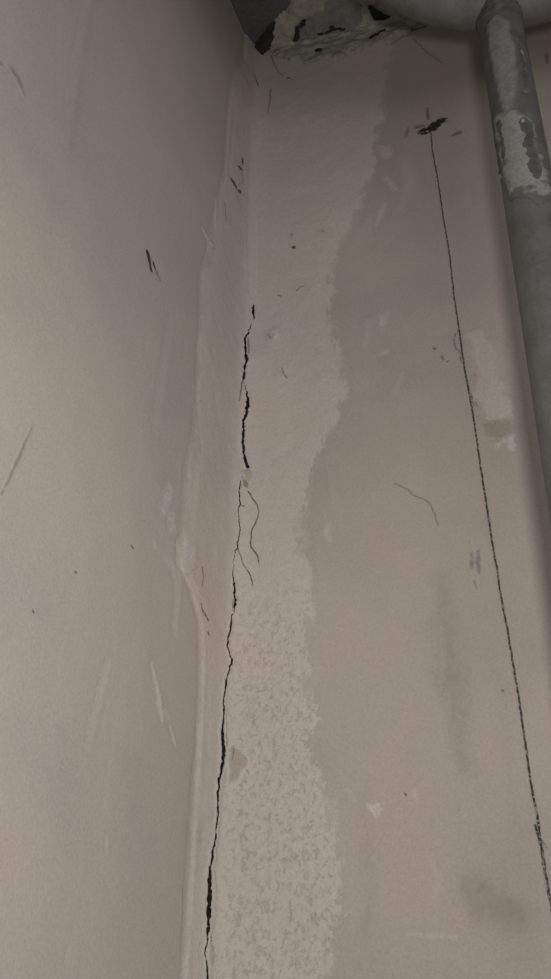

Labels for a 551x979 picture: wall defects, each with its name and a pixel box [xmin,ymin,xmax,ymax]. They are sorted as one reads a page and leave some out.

flaking render [254,0,418,64]
crack [201,304,260,979]
crack [395,483,439,526]
crack [430,131,551,915]